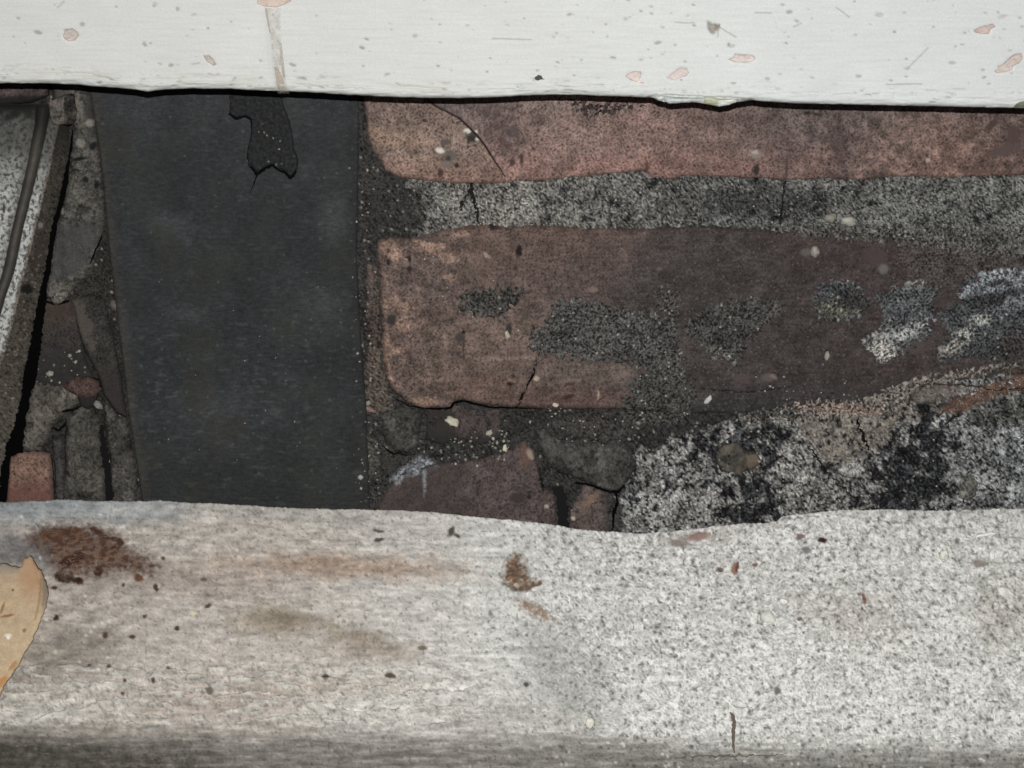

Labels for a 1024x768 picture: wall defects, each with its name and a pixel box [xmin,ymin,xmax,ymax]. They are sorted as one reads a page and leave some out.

spalling [228,89,298,193]
crack [459,183,480,225]
crack [392,346,541,410]
corrosion [27,524,160,583]
corrosion [503,553,547,618]